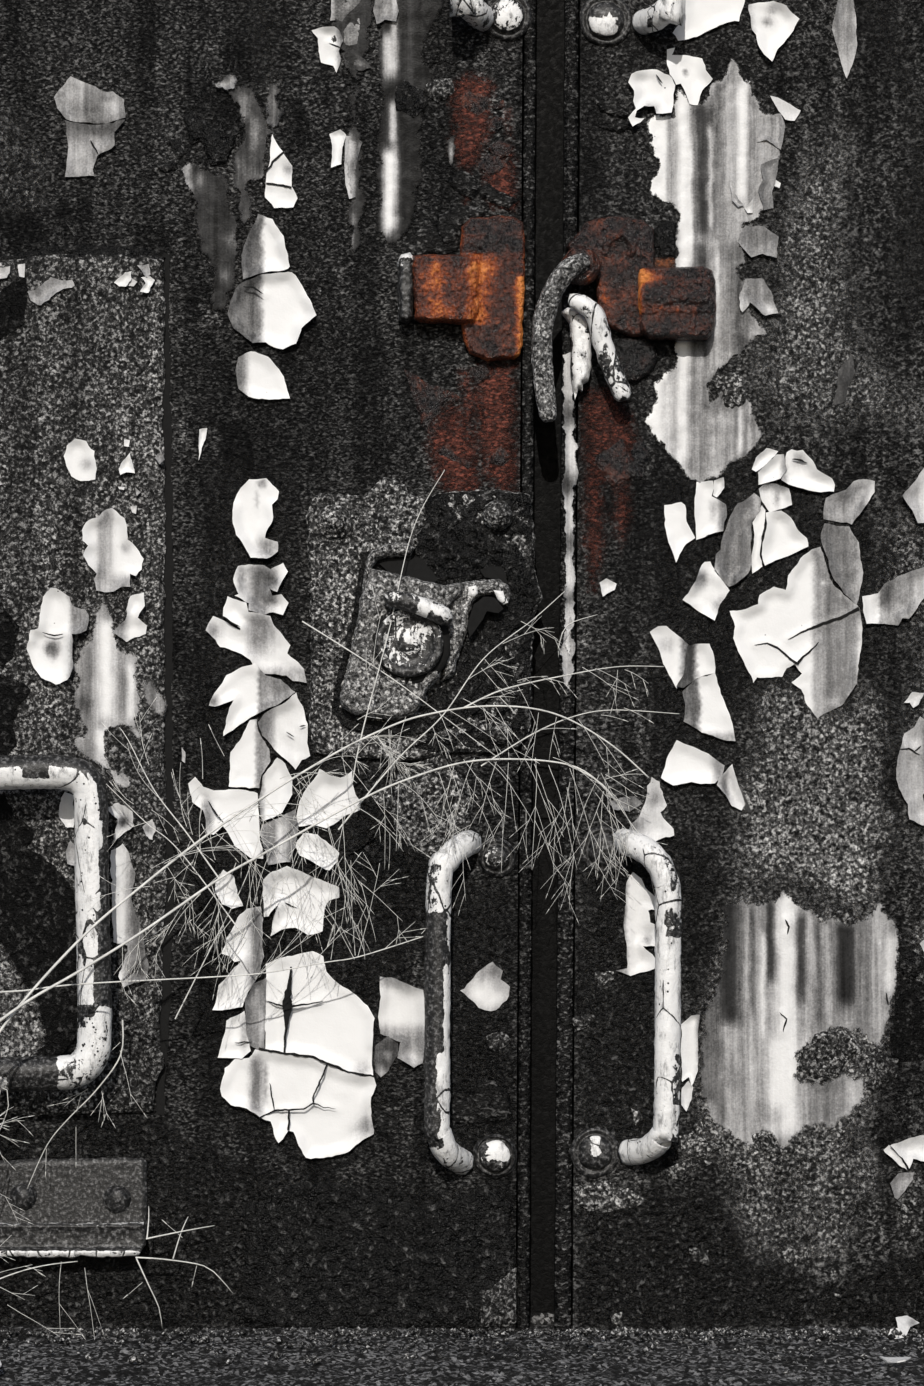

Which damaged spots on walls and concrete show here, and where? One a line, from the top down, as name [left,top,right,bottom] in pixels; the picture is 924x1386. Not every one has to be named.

peeling [182,75,316,400]
peeling [312,0,443,252]
rust [395,75,520,255]
rust [653,221,677,267]
peeling [0,439,167,987]
peeling [188,478,425,1159]
rust [404,361,514,491]
rust [587,391,650,565]
peeling [664,448,924,718]
crack [756,607,860,665]
crack [259,967,374,1130]
peeling [681,892,924,1149]